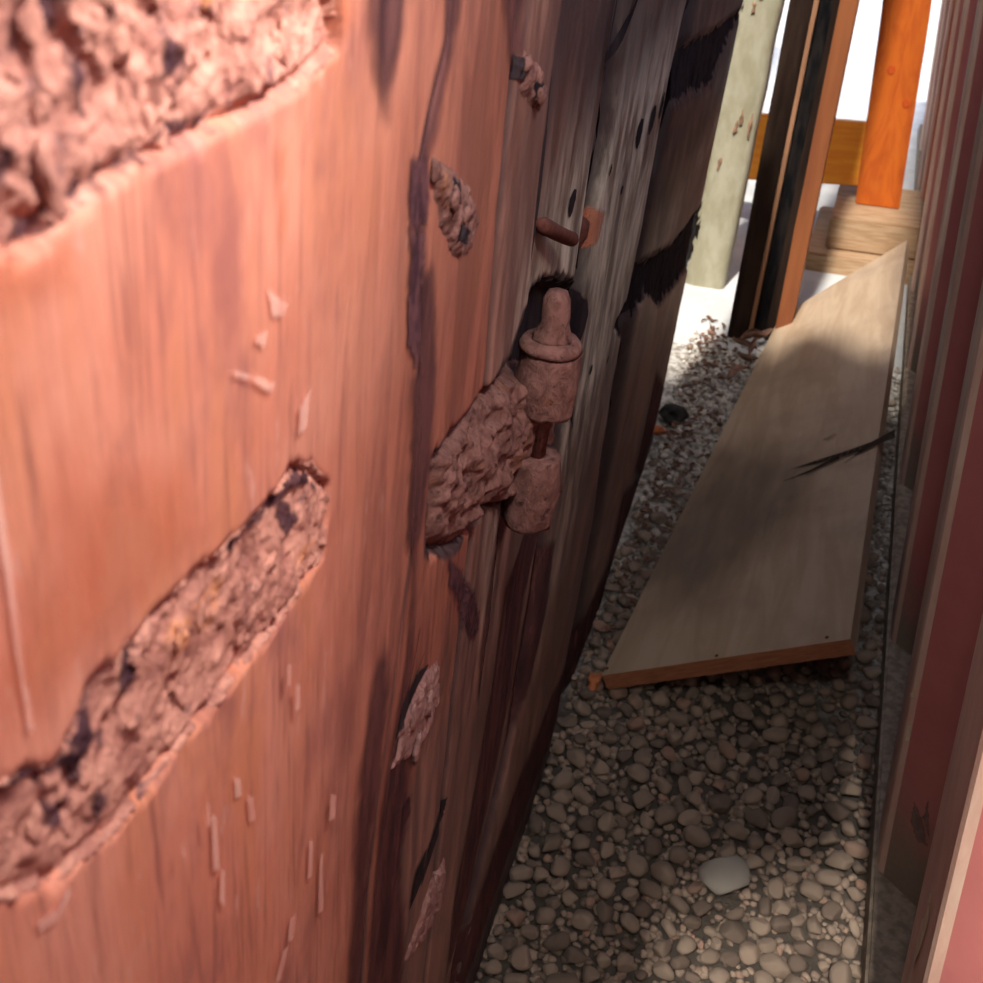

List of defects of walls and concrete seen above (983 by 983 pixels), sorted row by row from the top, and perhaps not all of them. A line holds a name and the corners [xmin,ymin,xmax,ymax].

spalling [0,0,337,262]
corrosion [582,209,604,246]
spalling [0,459,329,912]
peeling [272,915,296,983]